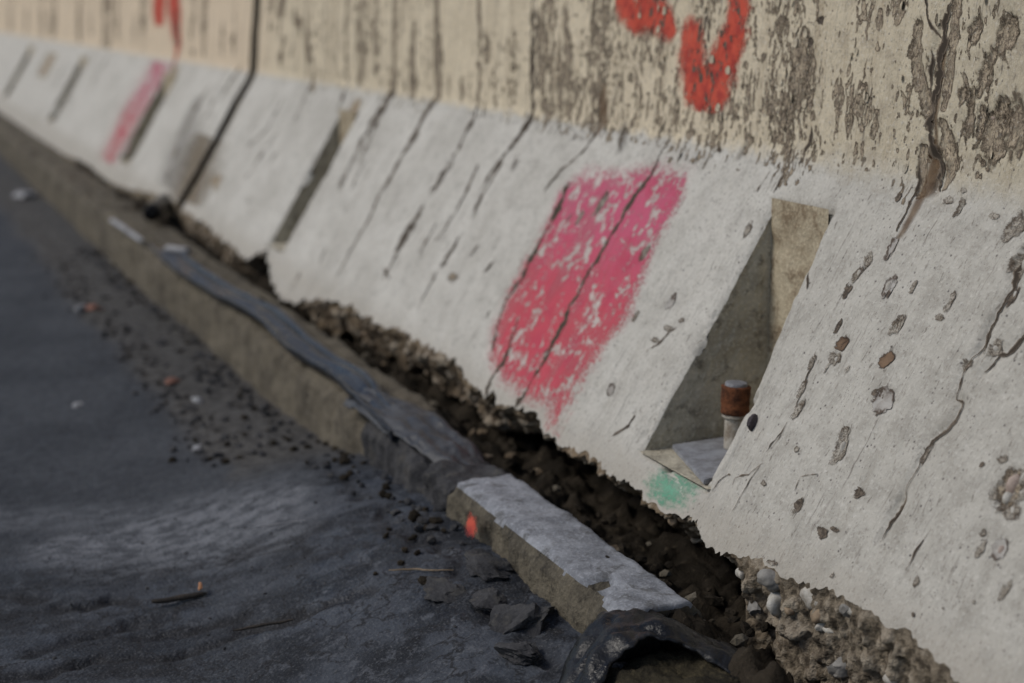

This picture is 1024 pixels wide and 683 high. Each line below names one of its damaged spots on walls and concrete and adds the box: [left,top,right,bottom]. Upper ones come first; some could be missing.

peeling [266,0,1024,217]
crack [896,0,952,231]
crack [485,122,666,408]
hole [791,318,850,420]
hole [817,526,839,539]
spalling [829,426,850,465]
hole [871,386,894,416]
hole [878,314,906,368]
crack [882,264,1024,539]
hole [989,455,1024,520]